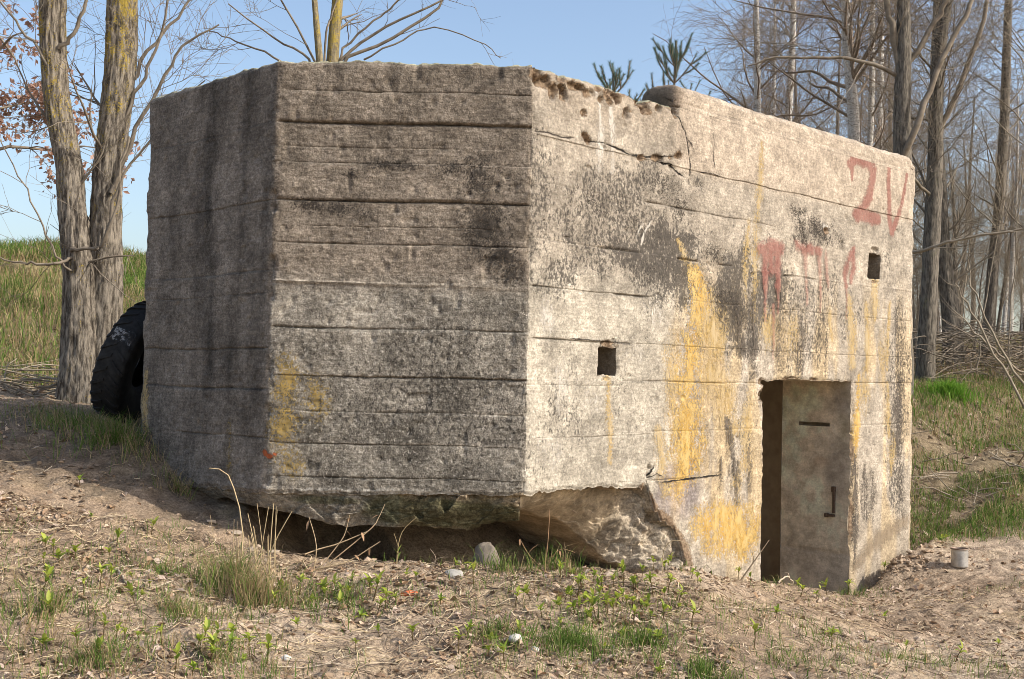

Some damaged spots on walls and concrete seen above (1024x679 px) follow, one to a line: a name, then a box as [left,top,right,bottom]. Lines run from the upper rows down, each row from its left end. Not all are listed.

spalling [529,67,677,119]
crack [535,116,718,178]
damp [573,189,658,245]
damp [638,172,696,222]
damp [654,141,907,565]
crack [645,465,724,486]
spalling [639,483,693,567]